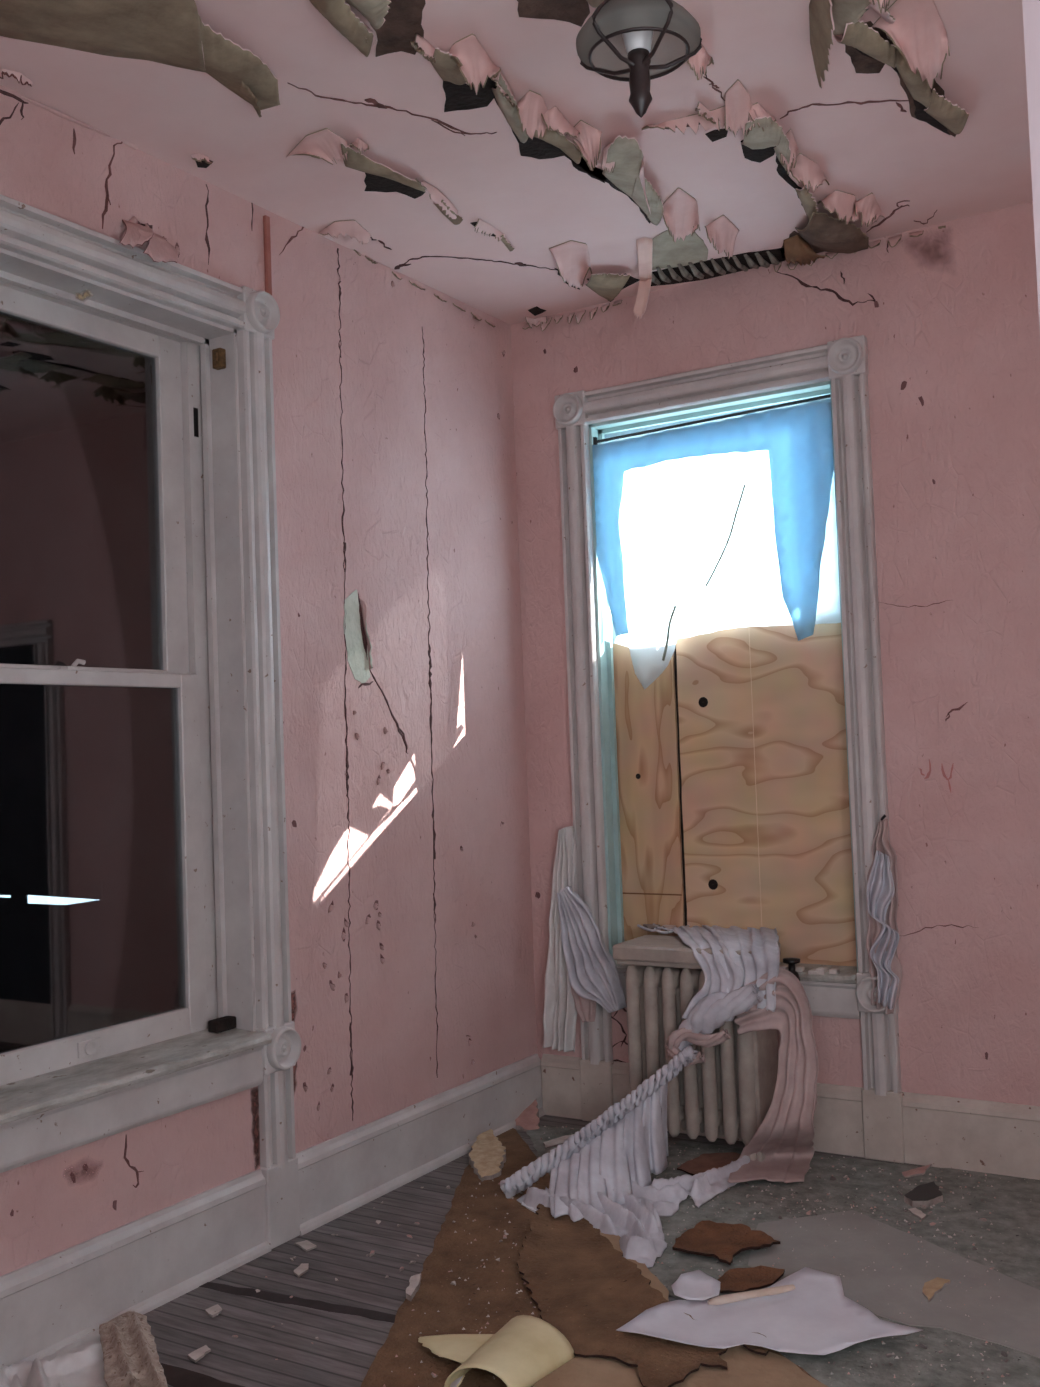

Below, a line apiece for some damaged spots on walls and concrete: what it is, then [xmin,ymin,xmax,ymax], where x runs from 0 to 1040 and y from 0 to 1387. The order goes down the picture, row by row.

crack [0,89,29,125]
crack [287,82,497,136]
crack [70,129,78,154]
crack [102,142,123,229]
spalling [191,153,213,168]
peeling [286,0,969,331]
crack [203,184,211,265]
crack [370,237,556,270]
crack [777,271,876,306]
spalling [343,589,373,683]
crack [337,248,438,1121]
crack [124,1135,143,1188]